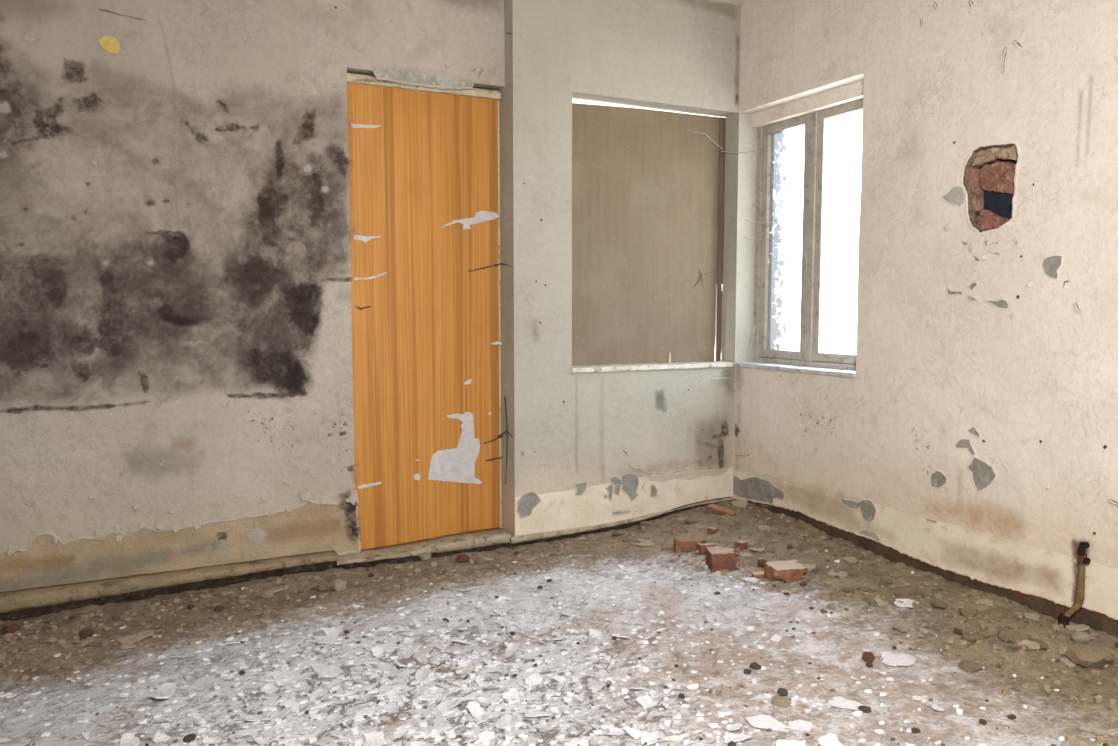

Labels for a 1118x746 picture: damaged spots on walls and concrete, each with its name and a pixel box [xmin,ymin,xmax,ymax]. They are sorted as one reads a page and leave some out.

crack [998,40,1023,74]
water stain [0,82,62,157]
water stain [302,114,314,139]
spalling [940,139,1022,260]
water stain [0,231,207,381]
water stain [226,143,351,398]
crack [1064,281,1081,316]
peeling [954,425,998,493]
peeling [0,479,361,592]
flaking render [732,474,1118,638]
rust [1073,541,1087,601]
crack [1106,499,1118,509]